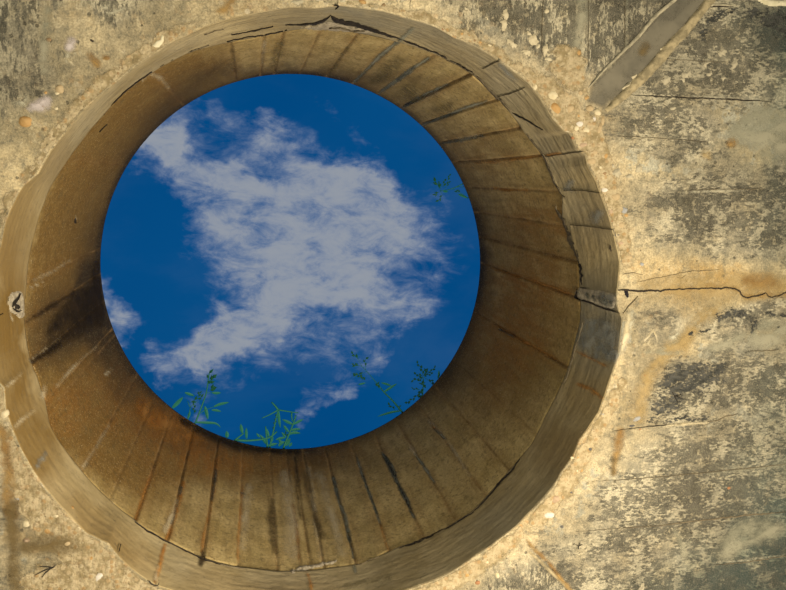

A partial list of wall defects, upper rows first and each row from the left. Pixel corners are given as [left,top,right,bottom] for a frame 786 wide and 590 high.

crack [99,60,172,132]
crack [190,3,786,314]
water stain [31,262,104,363]
rust [612,430,623,474]